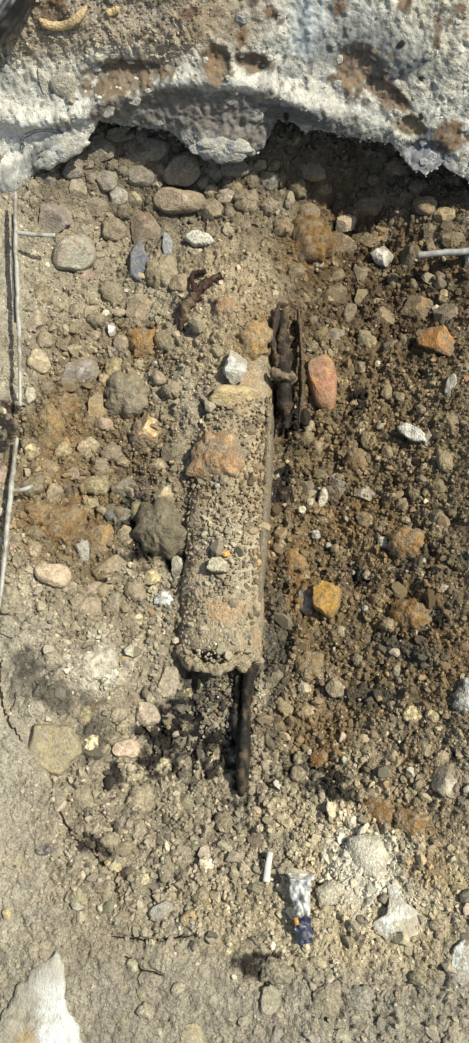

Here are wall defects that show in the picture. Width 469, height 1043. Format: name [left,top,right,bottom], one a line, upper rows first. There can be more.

corrosion [434,121,468,151]
crack [0,657,23,742]
crack [50,774,104,873]